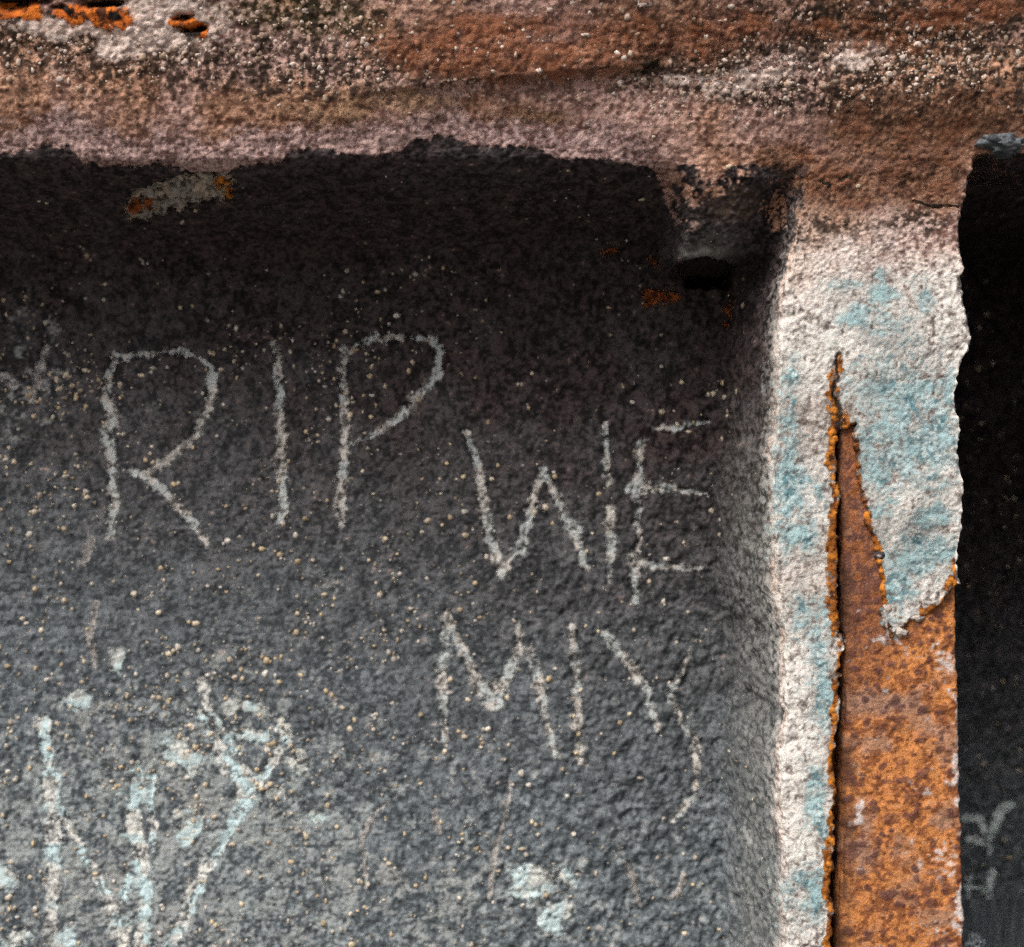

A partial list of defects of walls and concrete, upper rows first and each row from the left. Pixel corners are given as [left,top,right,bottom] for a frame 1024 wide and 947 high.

corrosion [0,0,134,32]
corrosion [168,15,208,38]
peeling [829,268,959,638]
corrosion [899,558,957,622]
corrosion [821,354,888,947]